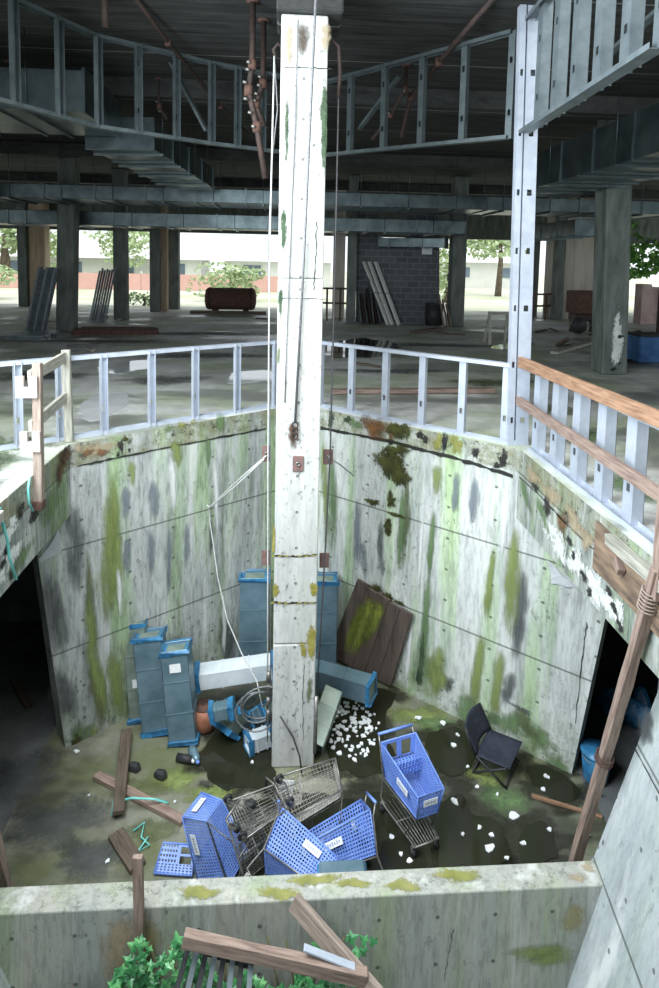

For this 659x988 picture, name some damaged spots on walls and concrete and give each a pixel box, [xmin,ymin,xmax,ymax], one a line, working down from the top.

peeling [611,311,624,371]
corrosion [362,415,399,440]
corrosion [56,443,111,487]
damp [148,485,157,514]
damp [169,442,182,505]
damp [206,439,219,552]
damp [521,481,548,531]
peeling [0,522,24,584]
damp [67,463,135,720]
damp [484,487,526,652]
peeling [540,516,624,633]
damp [456,639,515,721]